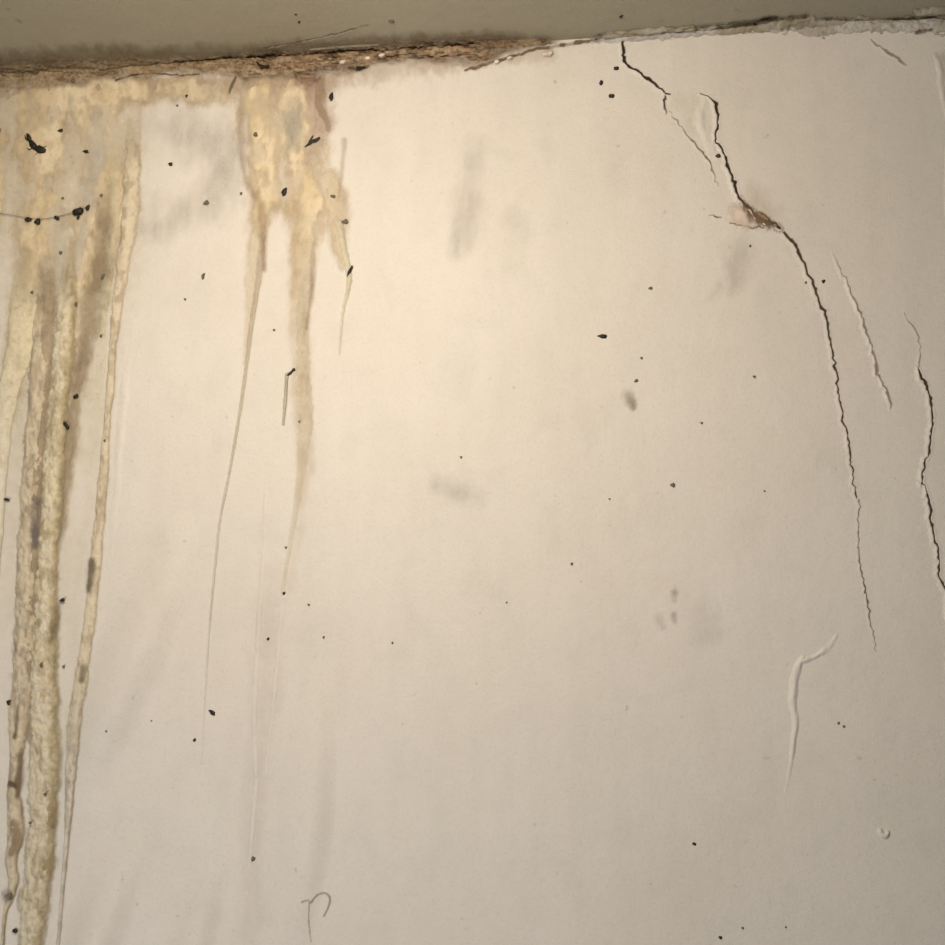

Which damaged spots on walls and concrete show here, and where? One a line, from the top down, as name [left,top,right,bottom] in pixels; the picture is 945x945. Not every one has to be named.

leakage [0,75,352,945]
crack [596,6,945,653]